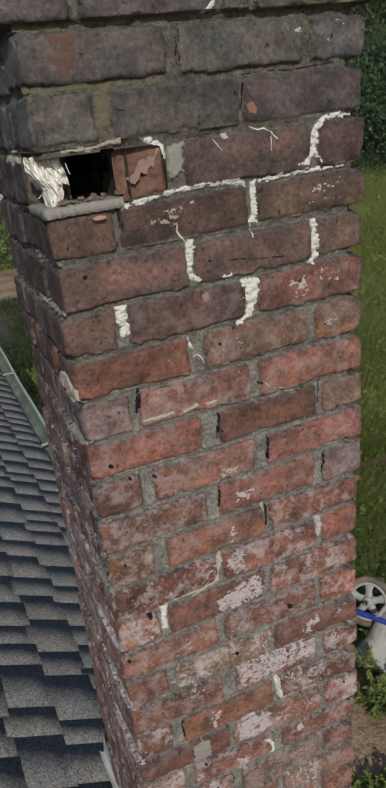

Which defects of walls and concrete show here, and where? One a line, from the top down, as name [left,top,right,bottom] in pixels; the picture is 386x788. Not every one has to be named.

spalling [14,151,45,210]
spalling [60,141,166,202]